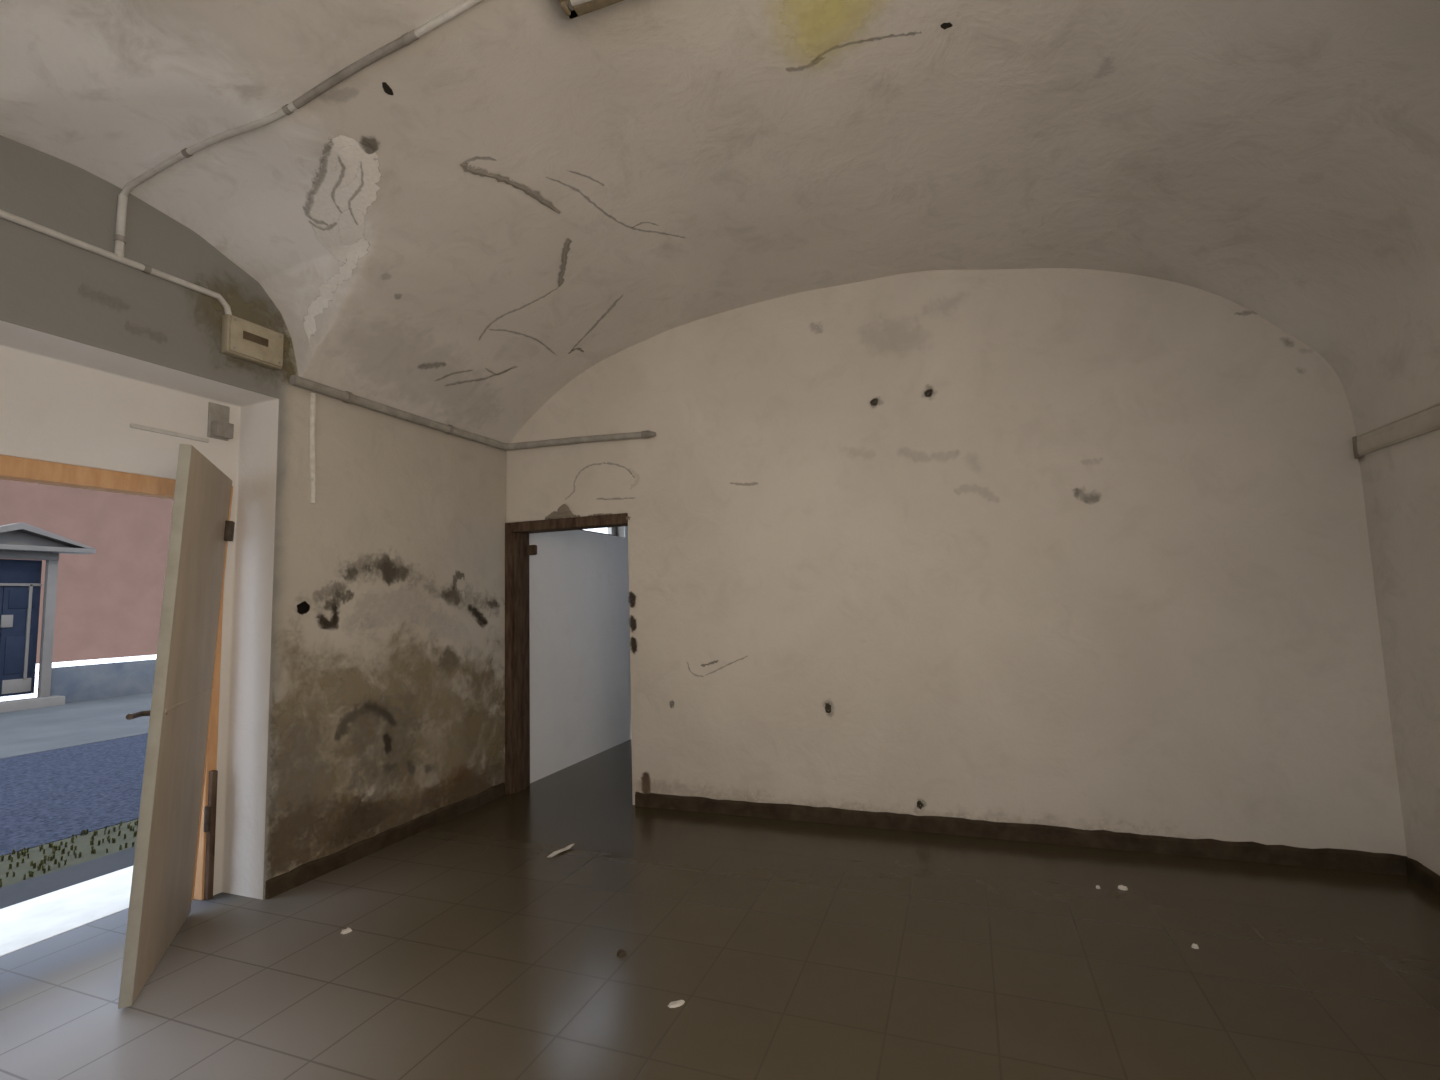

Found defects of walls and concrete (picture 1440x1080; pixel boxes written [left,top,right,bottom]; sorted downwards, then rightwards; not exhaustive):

mould [318,557,408,629]
mould [443,572,498,627]
damp [269,638,505,872]